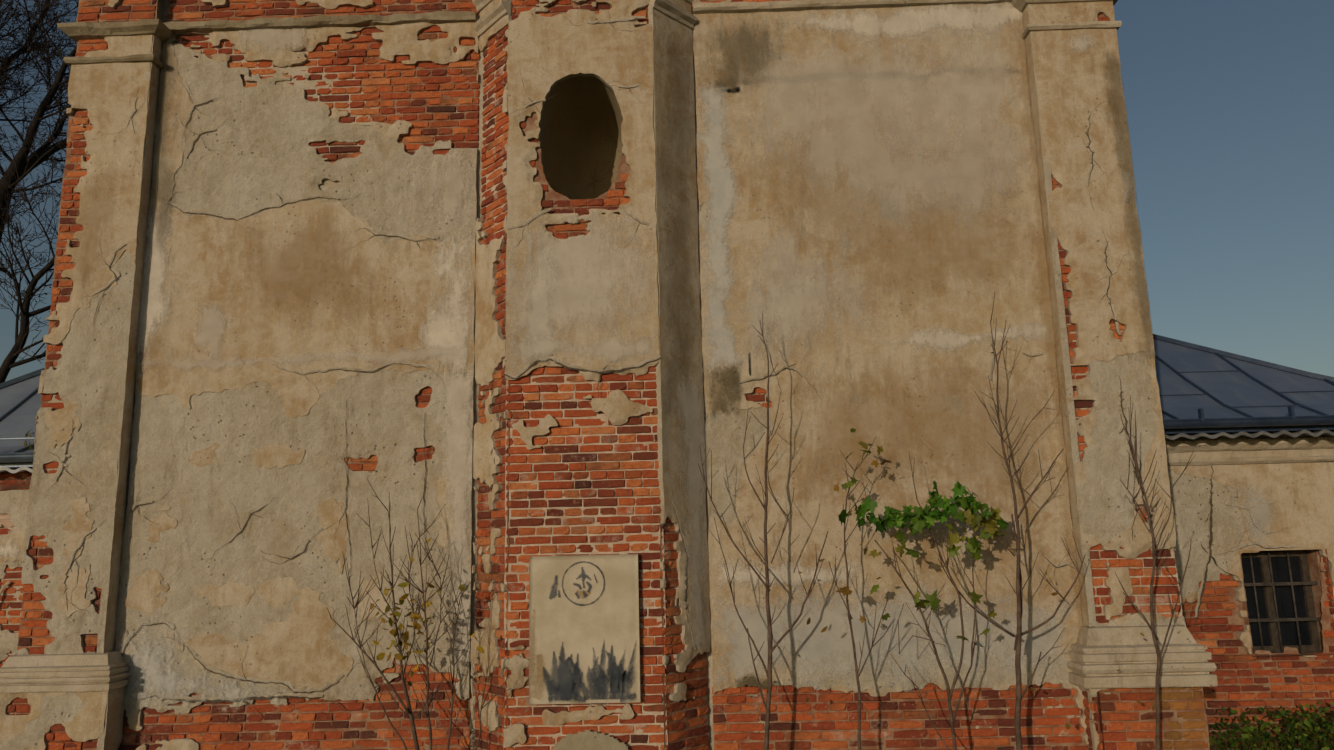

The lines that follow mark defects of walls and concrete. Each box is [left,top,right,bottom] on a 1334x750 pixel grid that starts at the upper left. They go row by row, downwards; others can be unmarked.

flaking render [632,6,649,28]
flaking render [48,106,93,334]
crack [157,76,439,249]
peeling [76,0,631,340]
peeling [699,198,713,232]
crack [1081,101,1161,569]
crack [121,620,368,716]
crack [209,355,445,606]
peeling [0,240,1334,750]
crack [1194,468,1309,640]